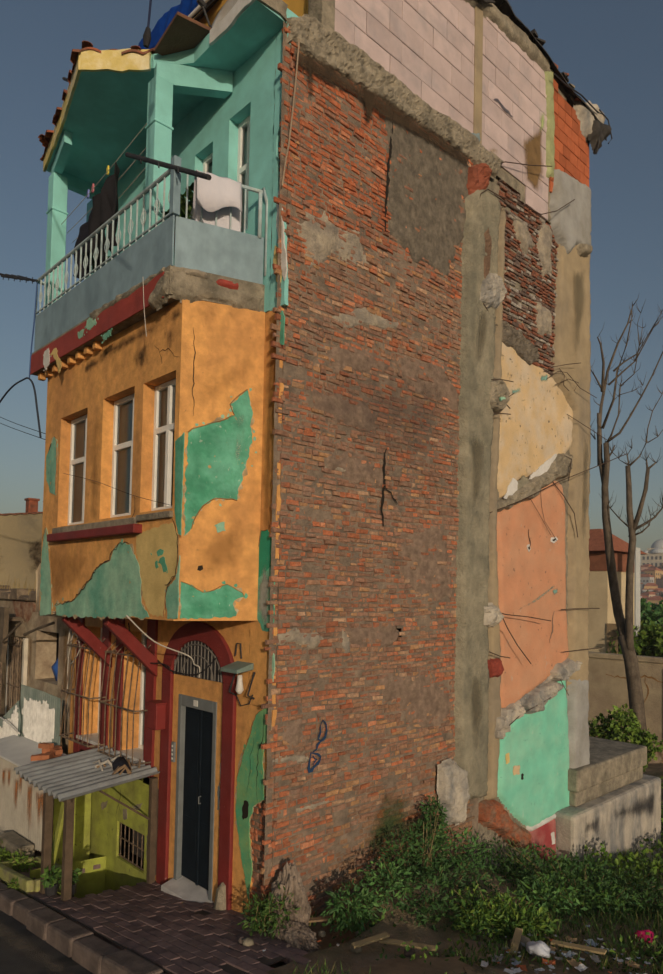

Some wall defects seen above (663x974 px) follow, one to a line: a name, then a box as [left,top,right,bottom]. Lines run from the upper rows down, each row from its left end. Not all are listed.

spalling [77,267,262,344]
spalling [479,228,508,312]
crack [154,330,196,416]
spalling [490,377,515,415]
spalling [495,321,597,398]
peeling [40,388,275,632]
crack [381,448,398,527]
corrosion [2,771,43,816]
peeling [235,708,272,898]